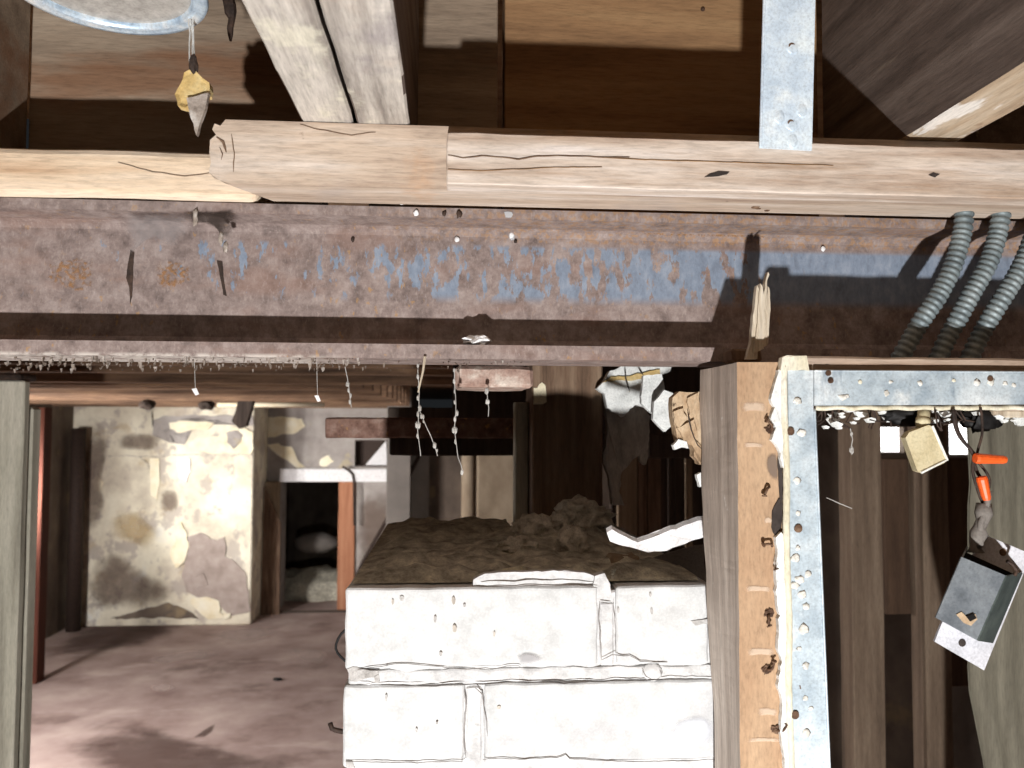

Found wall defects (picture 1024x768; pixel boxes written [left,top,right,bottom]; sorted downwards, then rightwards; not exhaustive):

rust [126,250,134,303]
rust [217,261,227,296]
flaking render [153,414,254,455]
peeling [268,416,305,468]
peeling [319,455,334,467]
damp [97,558,162,605]
flaking render [112,522,250,620]
crack [346,583,715,763]